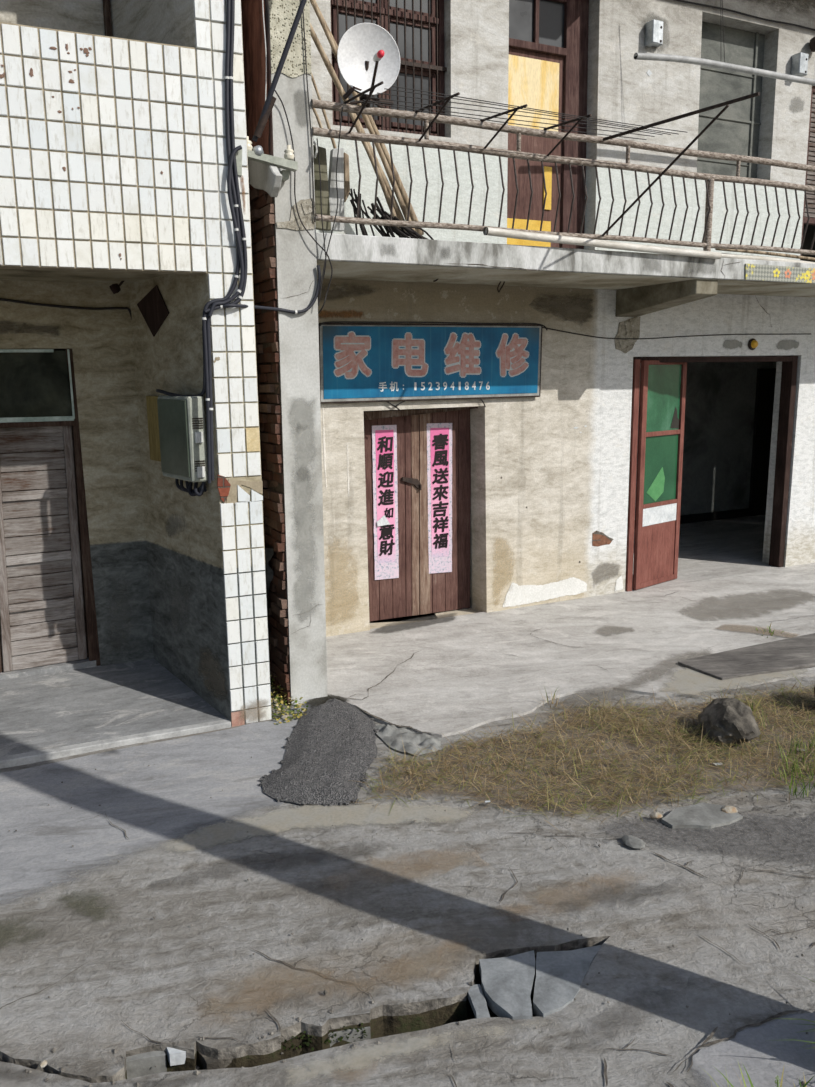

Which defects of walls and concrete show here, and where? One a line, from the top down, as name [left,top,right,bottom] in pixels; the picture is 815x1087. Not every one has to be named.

flaking render [614,317,640,353]
spalling [217,474,263,504]
flaking render [592,531,613,547]
peeling [503,577,587,607]
crack [750,910,815,949]
crack [0,961,89,1009]
crack [248,946,375,1002]
crack [265,1009,281,1030]
crack [604,1009,815,1087]